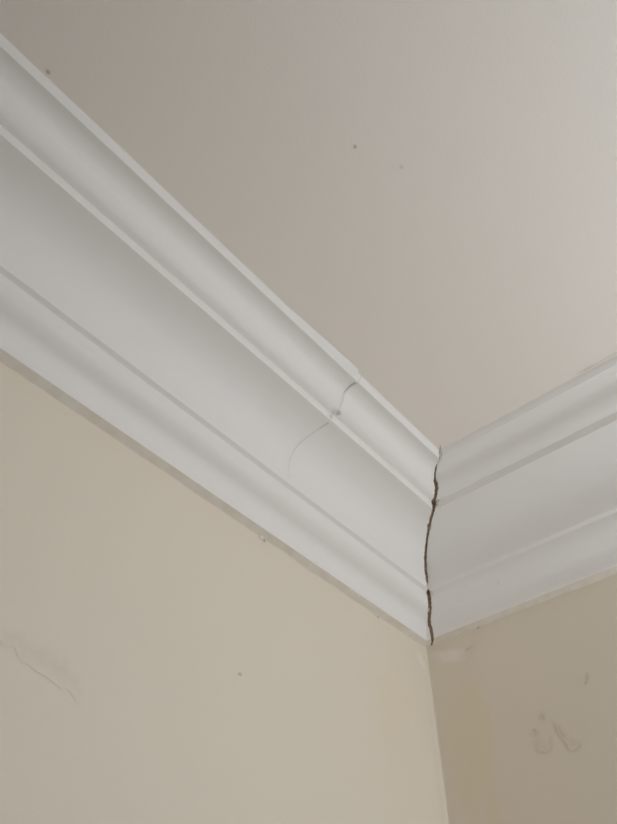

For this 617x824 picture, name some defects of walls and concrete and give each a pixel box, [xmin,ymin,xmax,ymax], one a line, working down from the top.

crack [424,444,443,646]